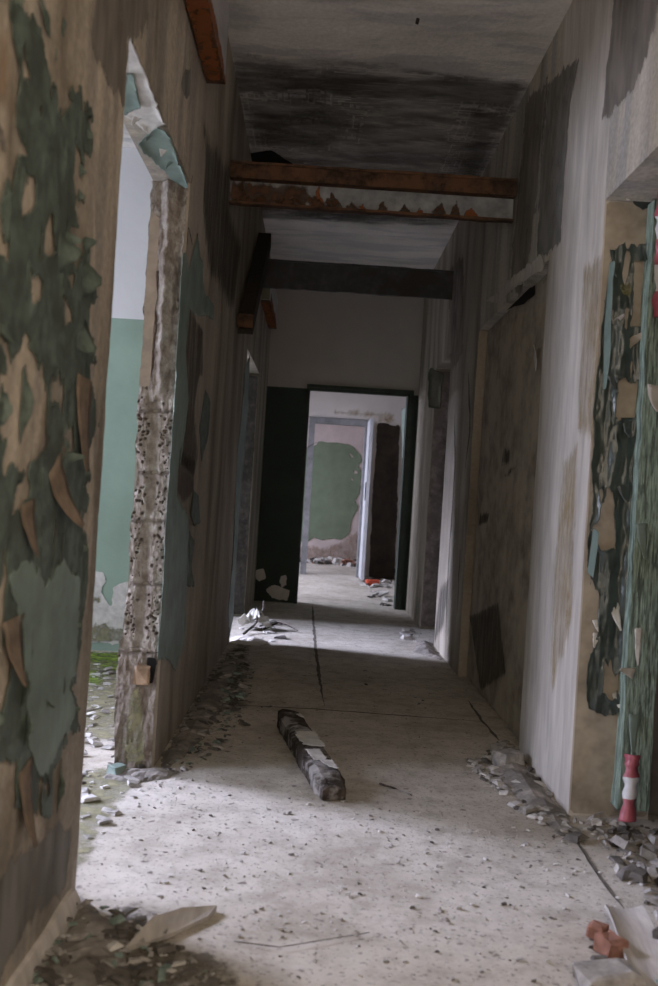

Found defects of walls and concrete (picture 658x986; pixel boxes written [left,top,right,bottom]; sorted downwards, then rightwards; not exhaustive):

rust [185,0,225,84]
leakage [236,59,579,297]
leakage [602,0,658,119]
peeling [0,0,214,848]
peeling [570,199,658,816]